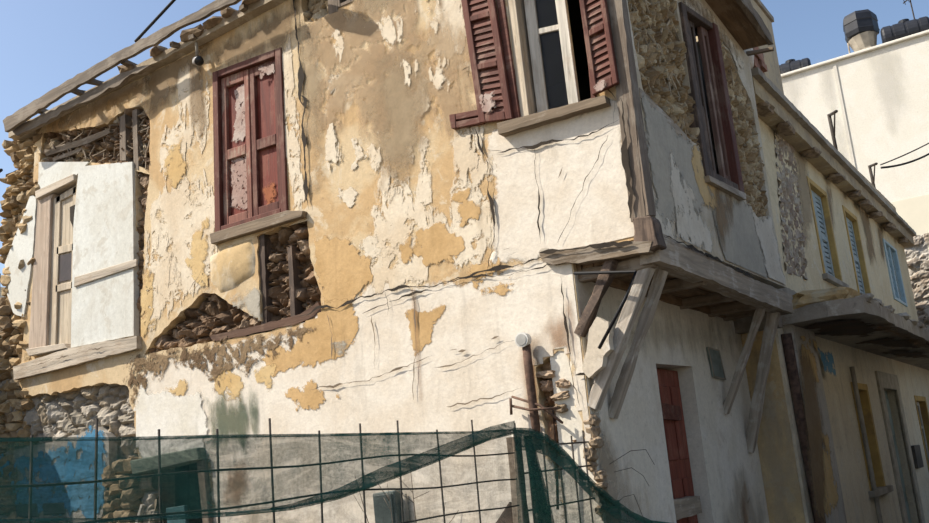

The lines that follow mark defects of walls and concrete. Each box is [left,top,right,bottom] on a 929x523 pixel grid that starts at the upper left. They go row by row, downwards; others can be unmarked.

crack [284,0,309,208]
spalling [303,0,328,22]
peeling [332,29,345,62]
peeling [376,15,403,45]
peeling [400,0,467,116]
spalling [627,0,822,285]
peeling [40,37,634,523]
crack [306,89,616,407]